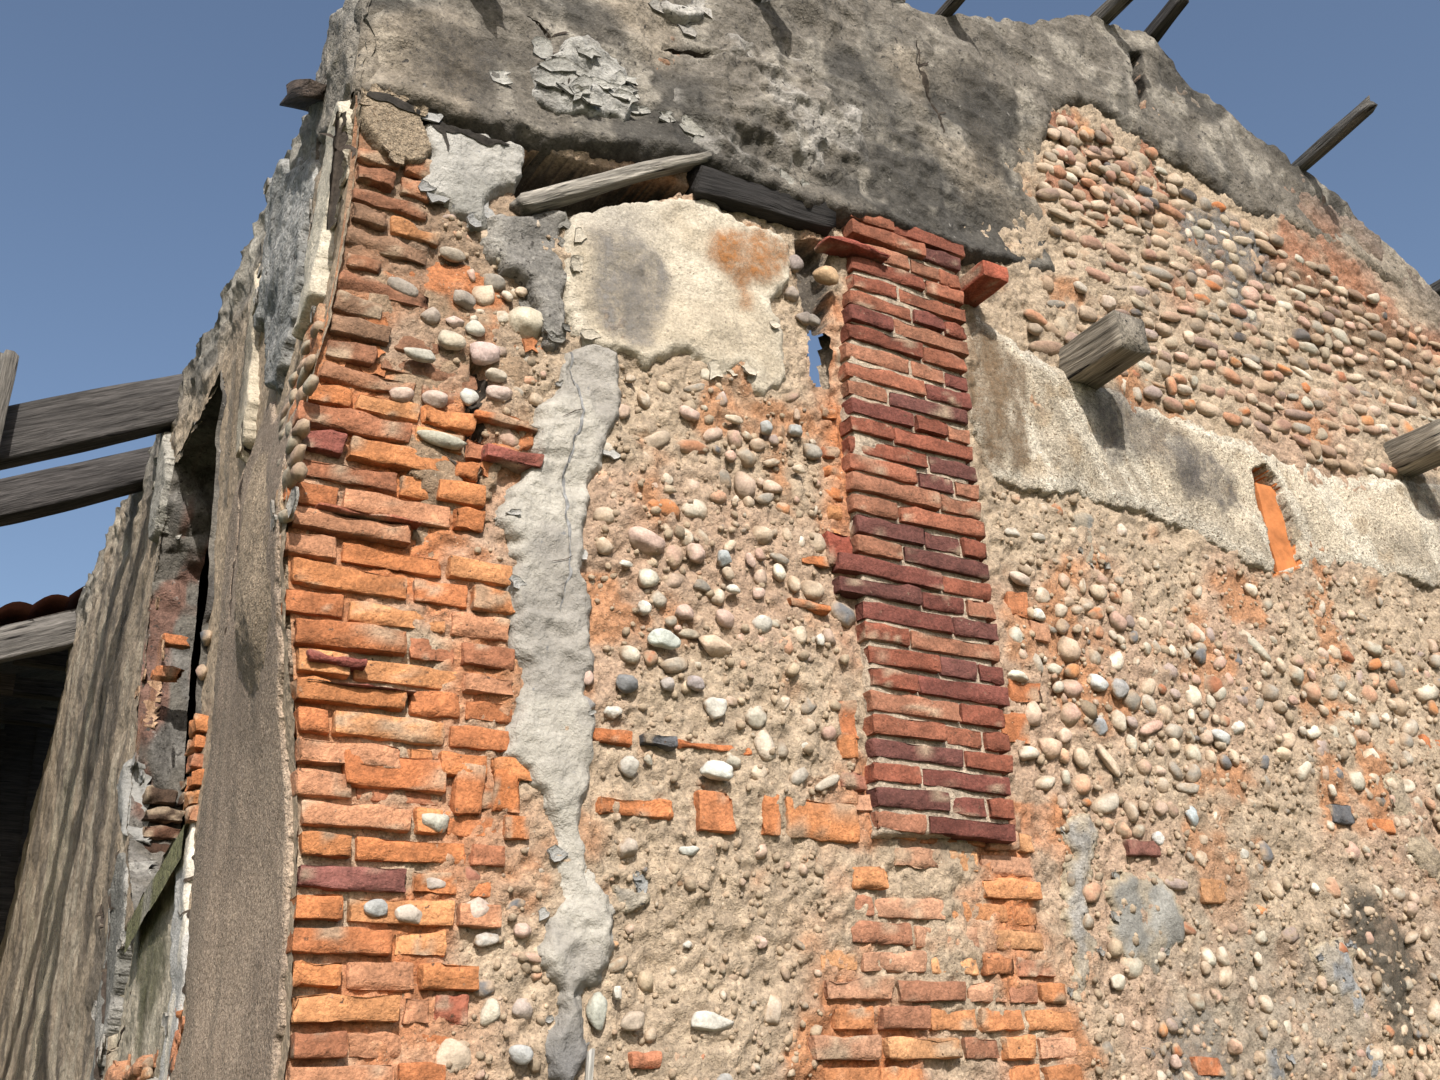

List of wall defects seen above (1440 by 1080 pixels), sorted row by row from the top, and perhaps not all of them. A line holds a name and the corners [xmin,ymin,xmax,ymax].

spalling [236,83,449,533]
peeling [339,198,790,515]
peeling [148,432,189,543]
spalling [411,526,435,558]
spalling [134,633,191,729]
leakage [18,614,126,1080]
peeling [90,752,196,1080]
peeling [538,907,550,921]
peeling [546,844,568,862]
peeling [633,870,648,893]